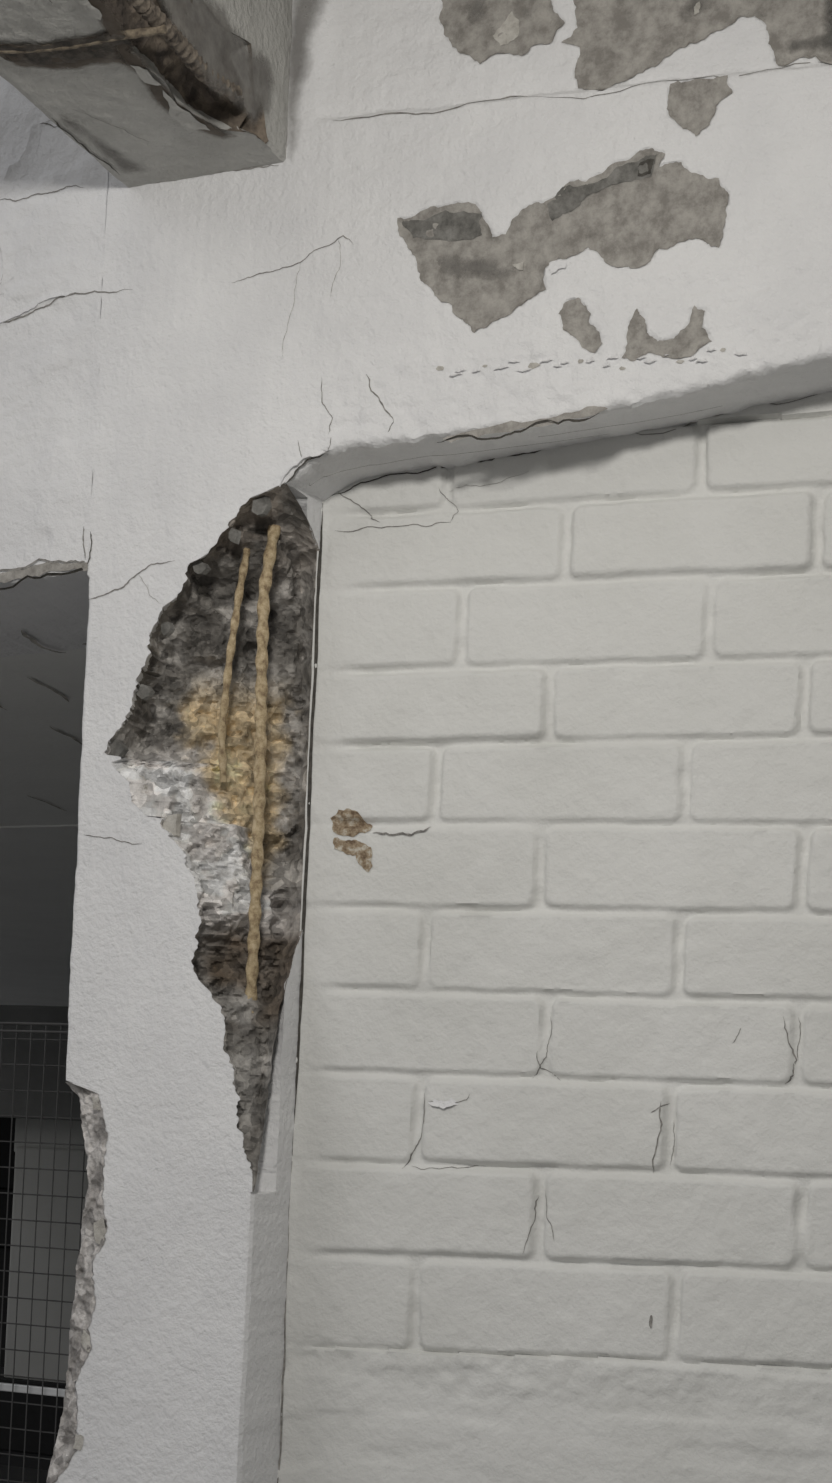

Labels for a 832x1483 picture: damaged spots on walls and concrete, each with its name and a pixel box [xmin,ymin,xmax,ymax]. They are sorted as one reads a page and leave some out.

crack [0,110,148,202]
spalling [0,0,272,144]
peeling [439,0,832,90]
peeling [667,75,732,136]
crack [0,289,132,323]
peeling [397,148,729,333]
spalling [103,484,320,1192]
spalling [46,1082,108,1483]